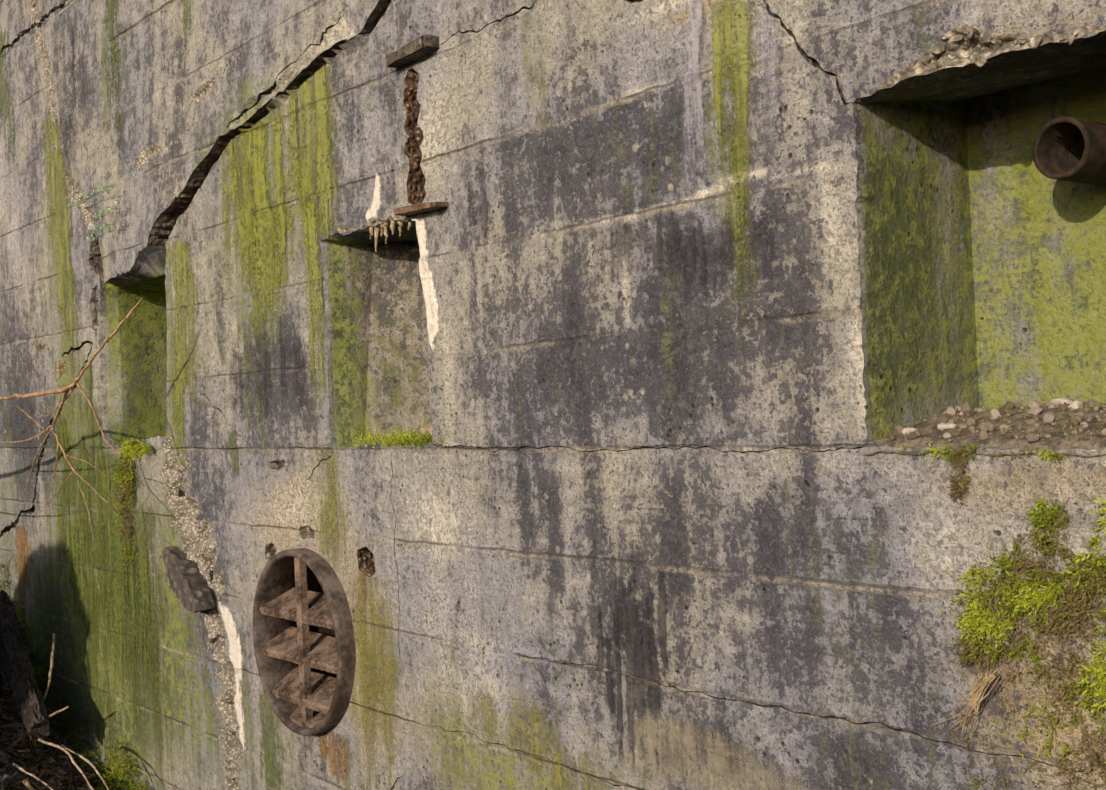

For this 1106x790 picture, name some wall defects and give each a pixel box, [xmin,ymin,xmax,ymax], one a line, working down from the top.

crack [440,0,538,45]
crack [763,0,852,105]
spalling [877,24,1106,89]
crack [147,0,391,246]
spalling [160,431,244,790]
spalling [357,547,376,577]